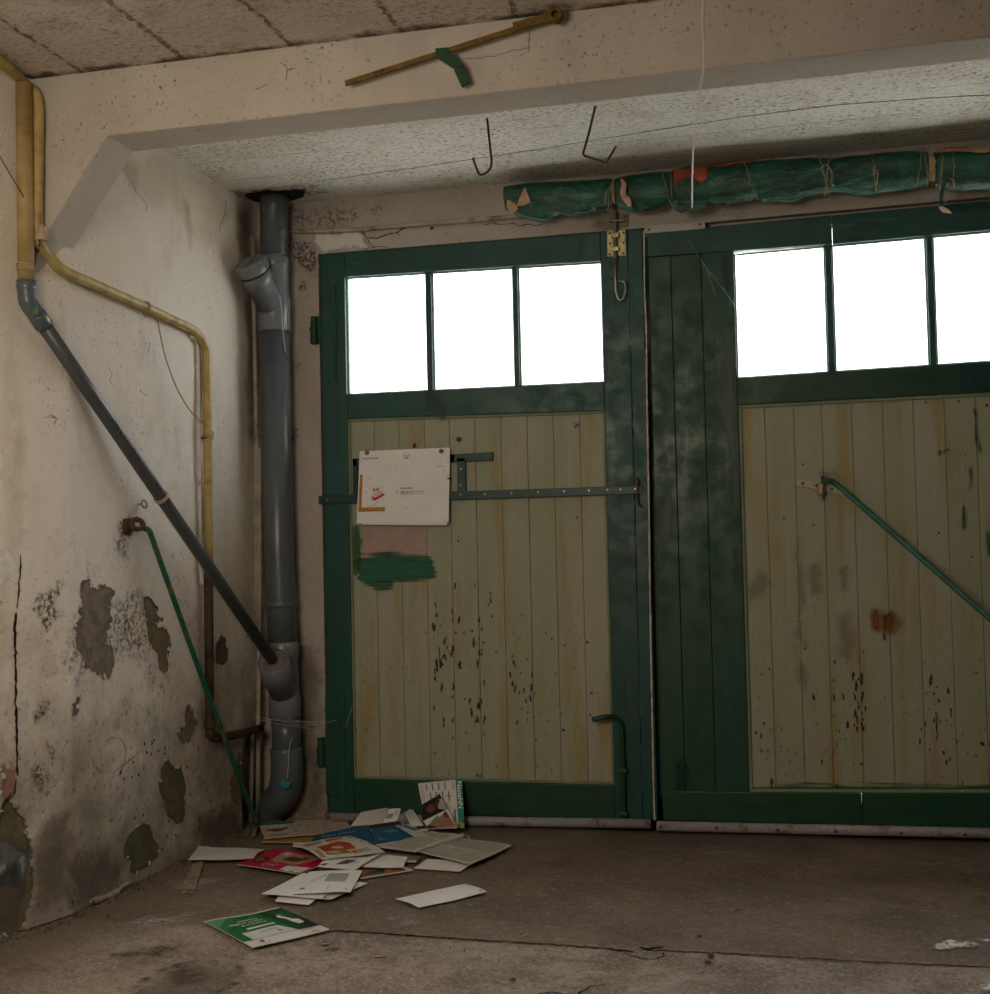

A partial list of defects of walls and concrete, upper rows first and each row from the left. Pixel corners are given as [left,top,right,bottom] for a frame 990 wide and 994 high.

crack [13,555,22,794]
spalling [64,580,171,688]
spalling [177,704,199,744]
spalling [0,762,36,937]
crack [539,984,605,994]
crack [328,930,990,968]